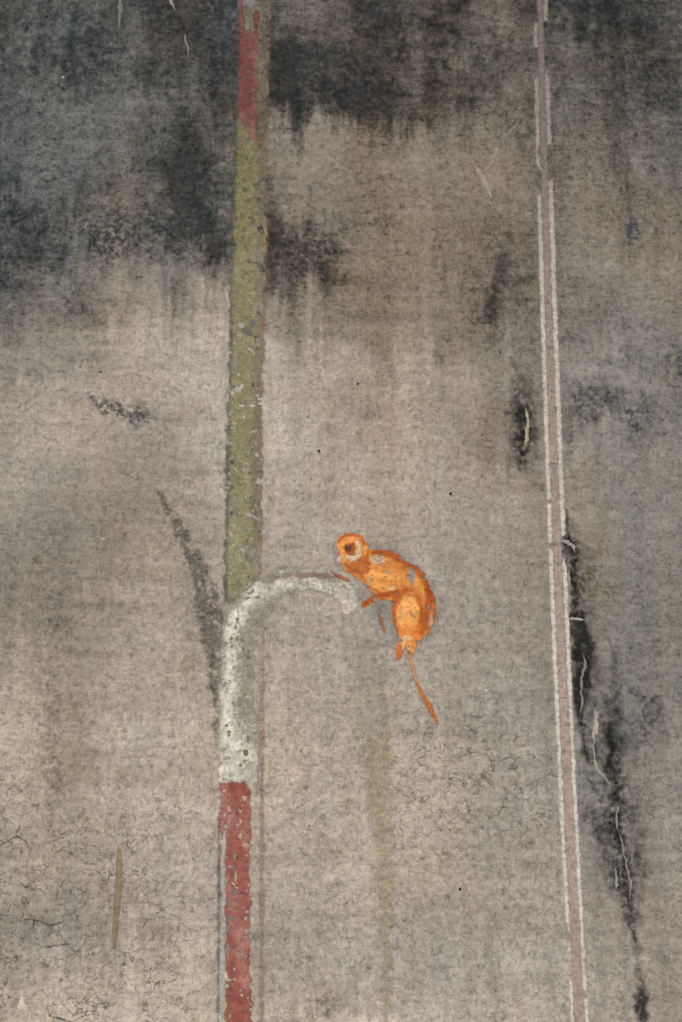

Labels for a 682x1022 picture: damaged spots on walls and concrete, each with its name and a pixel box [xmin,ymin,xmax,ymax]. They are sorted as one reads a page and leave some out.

leakage [484,260,505,323]
leakage [512,392,536,471]
leakage [563,517,594,727]
leakage [582,708,639,942]
crack [20,918,68,947]